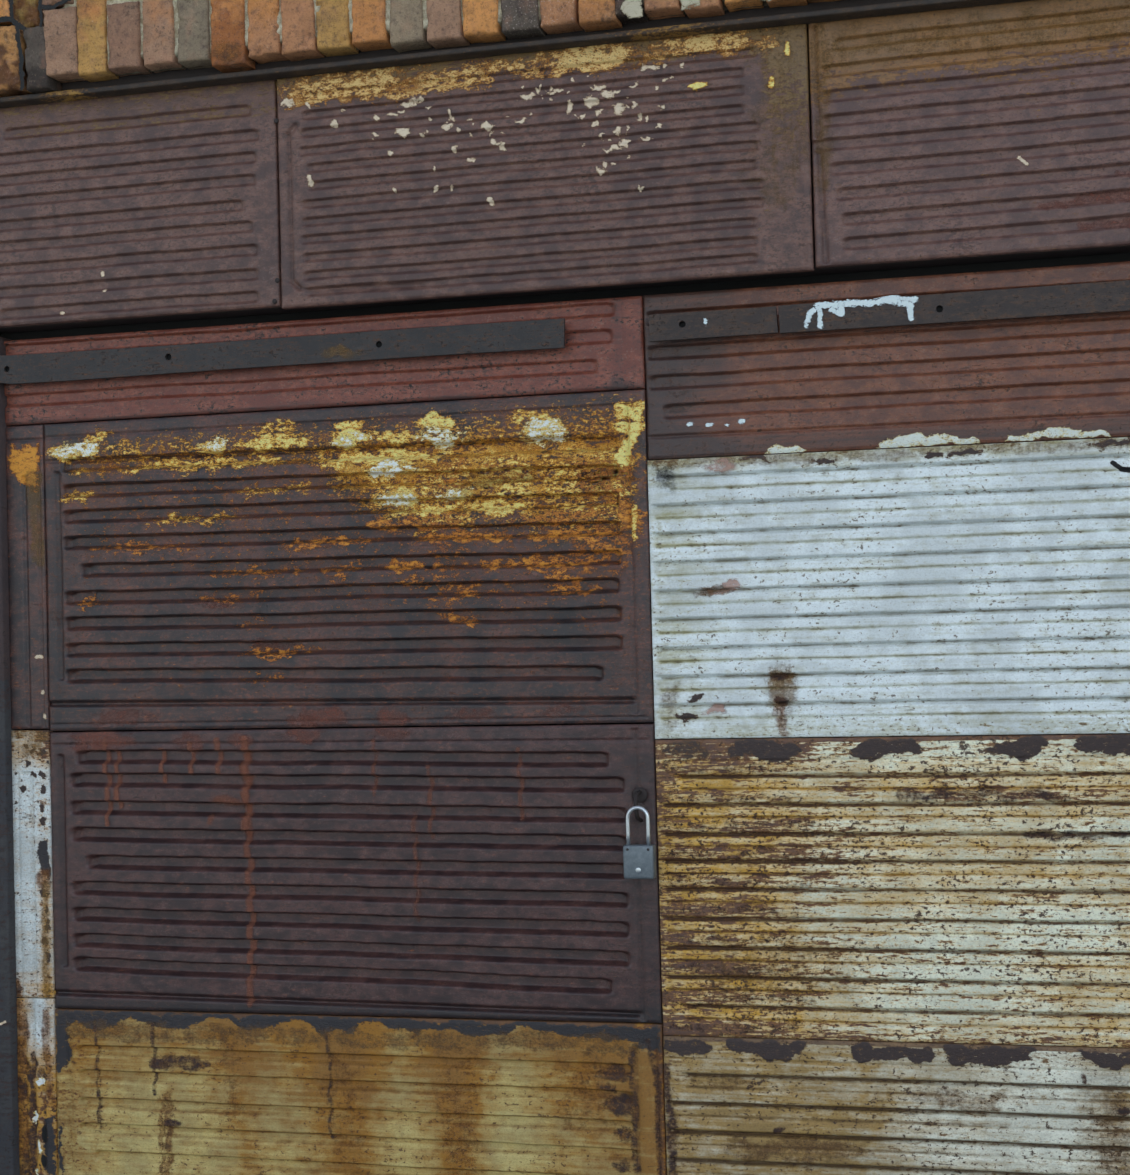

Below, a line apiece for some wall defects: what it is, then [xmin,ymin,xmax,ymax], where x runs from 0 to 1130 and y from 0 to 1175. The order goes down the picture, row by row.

peeling [371,95,507,162]
peeling [506,62,684,176]
peeling [687,82,708,91]
peeling [703,444,862,466]
peeling [876,426,1130,459]
peeling [44,393,674,687]
corrosion [770,671,797,735]
corrosion [896,786,1069,802]
corrosion [1023,829,1130,842]
corrosion [16,978,55,1175]
corrosion [149,1023,210,1174]
corrosion [572,1039,679,1175]